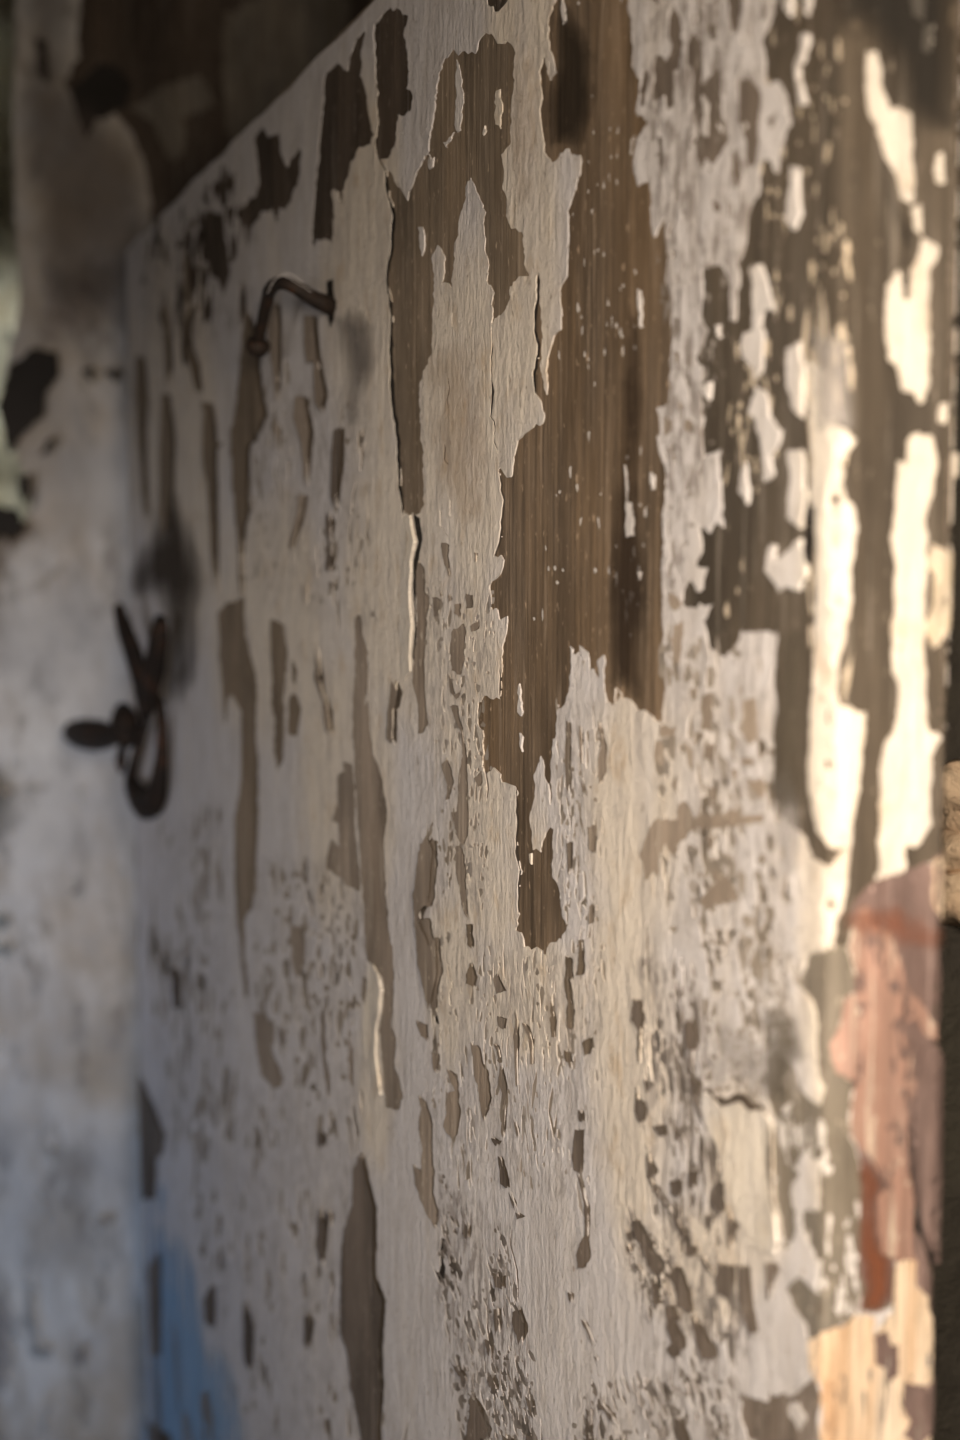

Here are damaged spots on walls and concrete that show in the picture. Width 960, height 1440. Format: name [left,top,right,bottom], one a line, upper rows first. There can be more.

peeling [35,38,49,83]
peeling [64,0,402,1440]
peeling [312,0,960,1440]